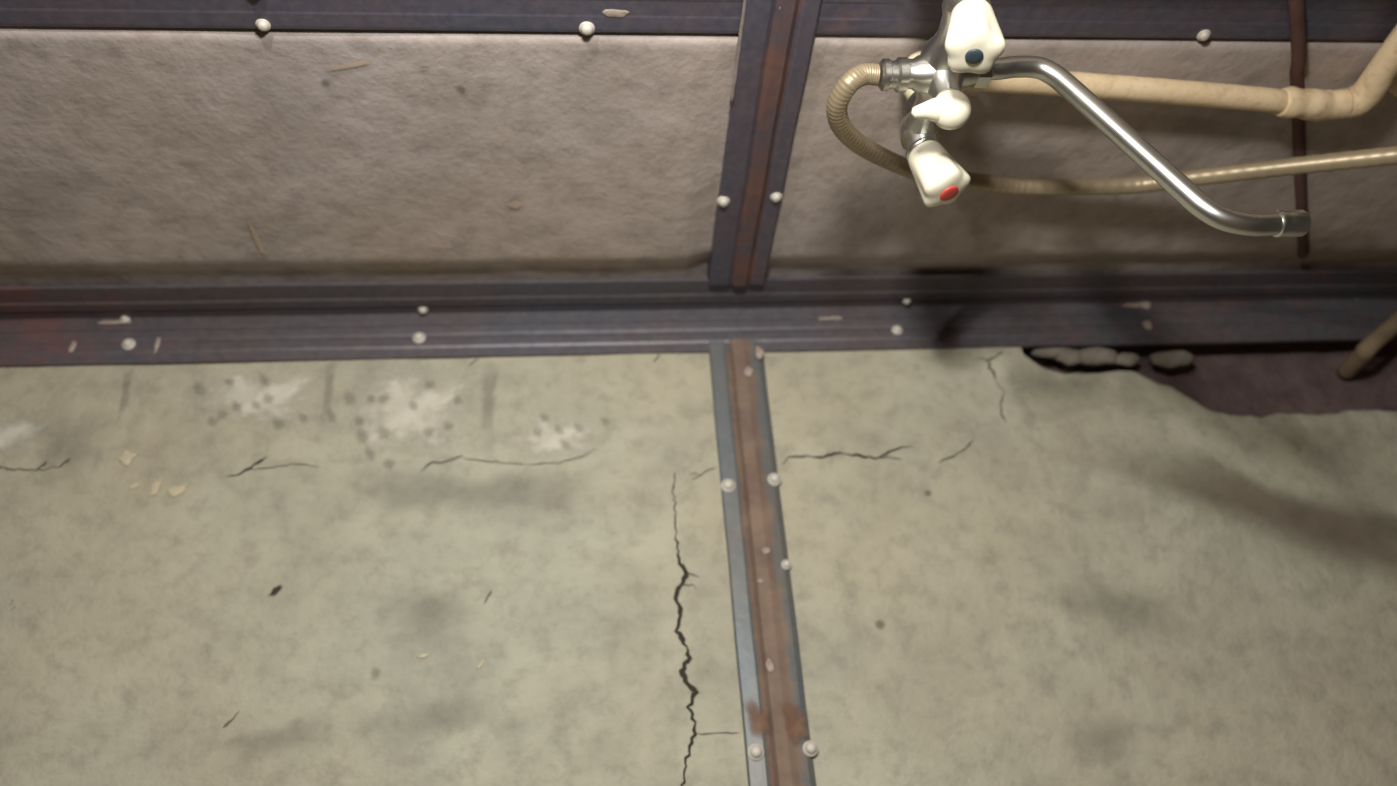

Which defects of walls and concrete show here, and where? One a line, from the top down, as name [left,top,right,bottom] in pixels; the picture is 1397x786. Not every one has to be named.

damp [208,373,310,421]
damp [356,377,463,446]
crack [977,351,1006,422]
damp [0,421,47,451]
damp [508,420,592,454]
crack [0,458,70,471]
crack [228,456,315,476]
crack [420,448,597,472]
crack [782,446,909,465]
crack [672,467,740,786]